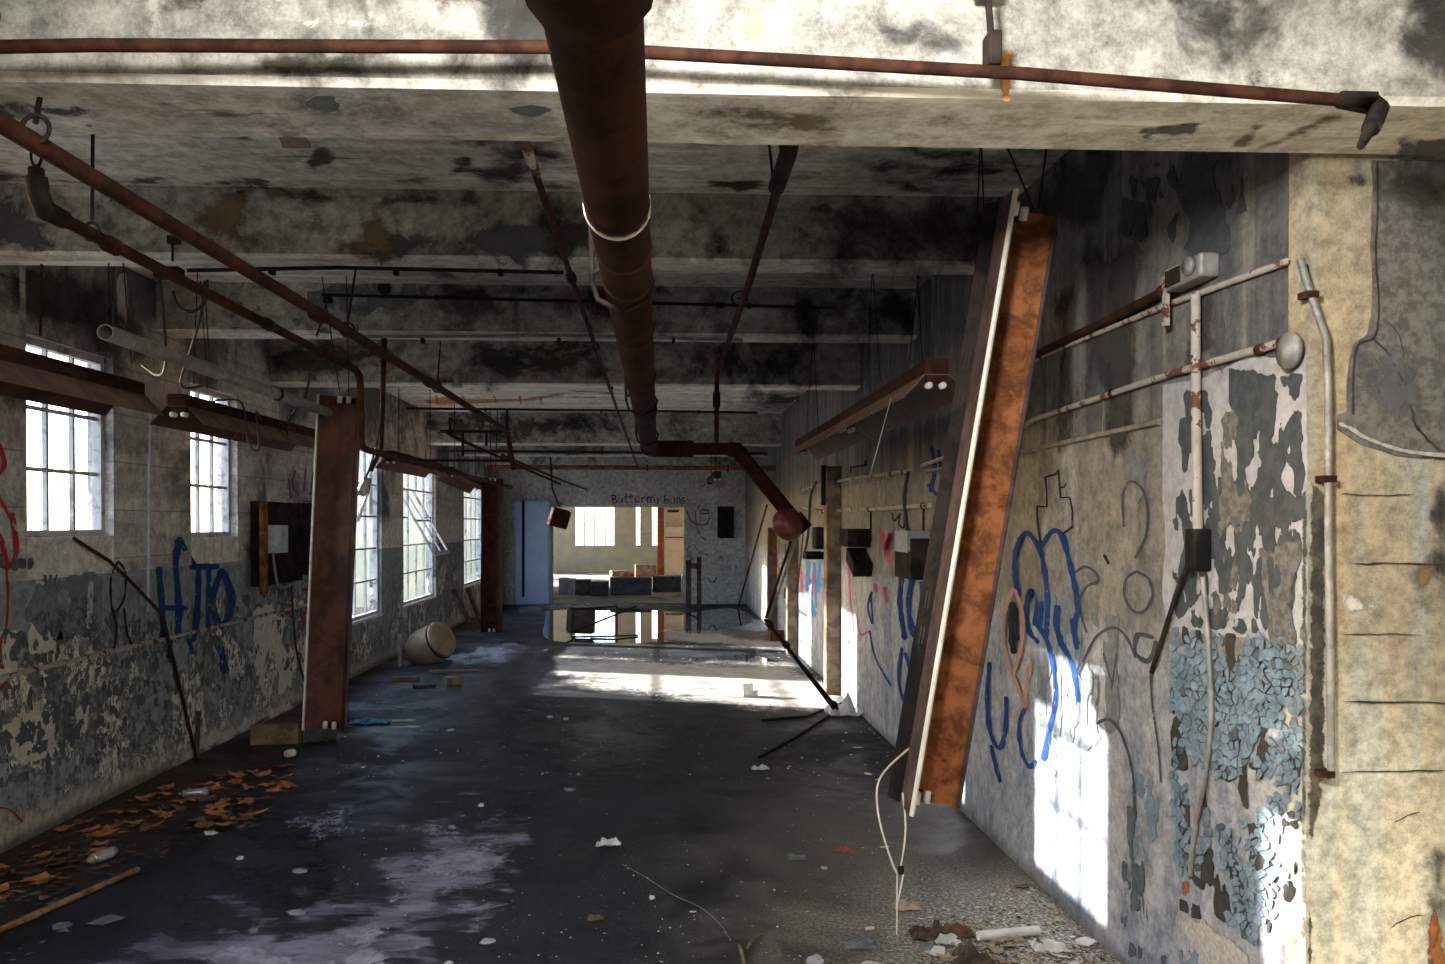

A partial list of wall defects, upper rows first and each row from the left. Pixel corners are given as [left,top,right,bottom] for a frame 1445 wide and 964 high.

water stain [0,171,145,359]
water stain [194,178,331,250]
water stain [307,148,334,167]
water stain [350,140,595,296]
water stain [453,285,611,391]
water stain [710,88,851,153]
water stain [683,147,1111,412]
water stain [1054,241,1143,456]
water stain [1139,123,1201,139]
water stain [1187,274,1236,373]
peeling [0,553,308,788]
peeling [1121,355,1308,964]